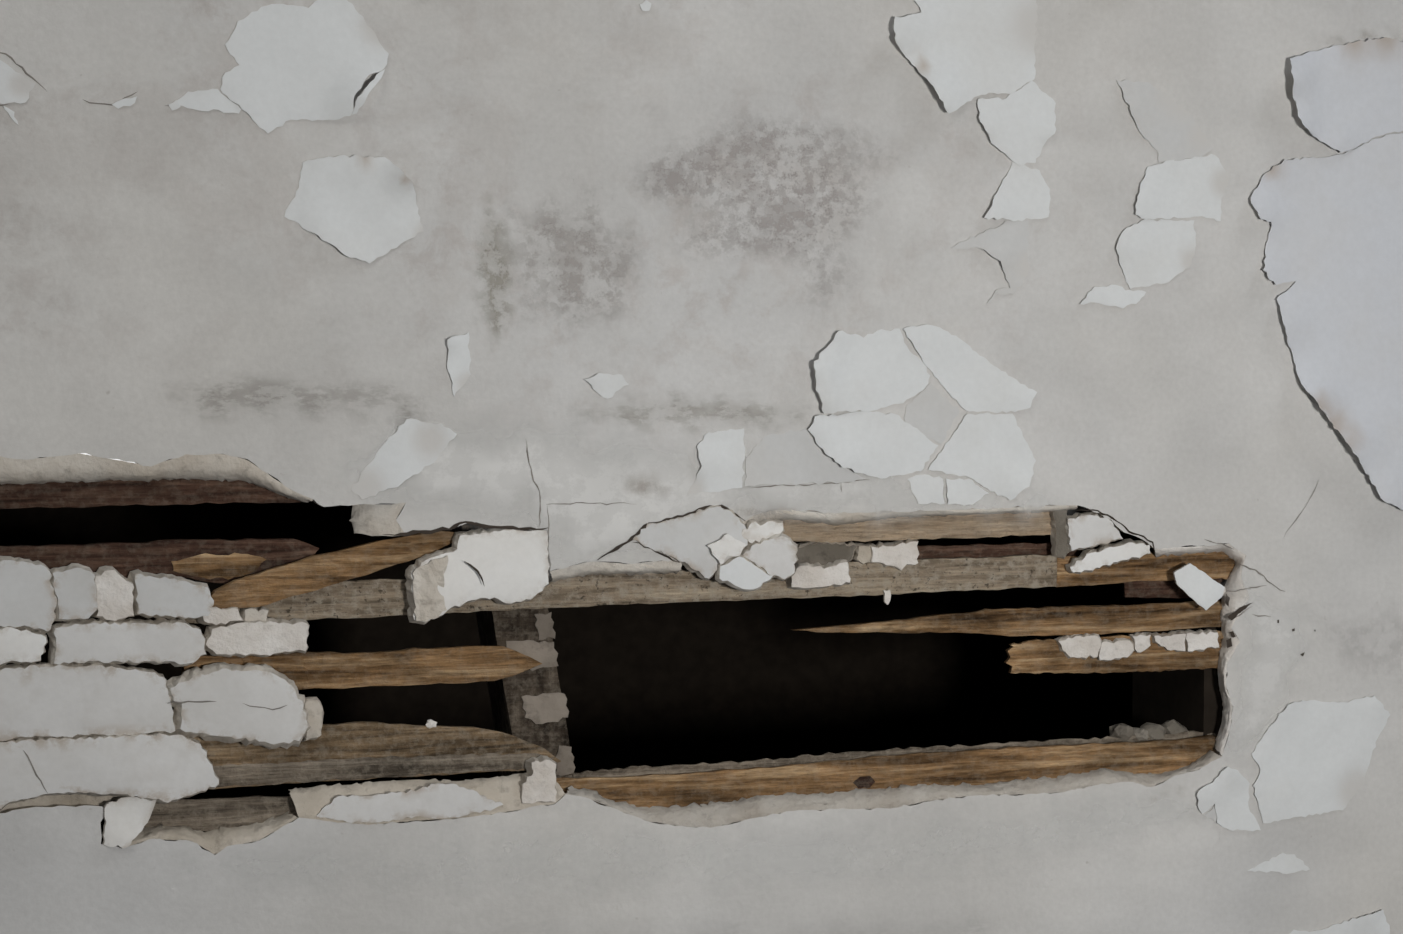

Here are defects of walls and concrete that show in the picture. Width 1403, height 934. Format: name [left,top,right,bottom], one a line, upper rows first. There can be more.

crack [0,52,46,90]
crack [84,91,169,106]
peeling [168,0,389,134]
peeling [284,155,424,263]
peeling [893,0,1056,304]
peeling [1080,79,1229,308]
peeling [1250,37,1403,510]
flaking render [0,453,313,503]
peeling [349,418,457,536]
peeling [688,324,1078,526]
peeling [130,544,1390,854]
flaking render [0,794,123,812]